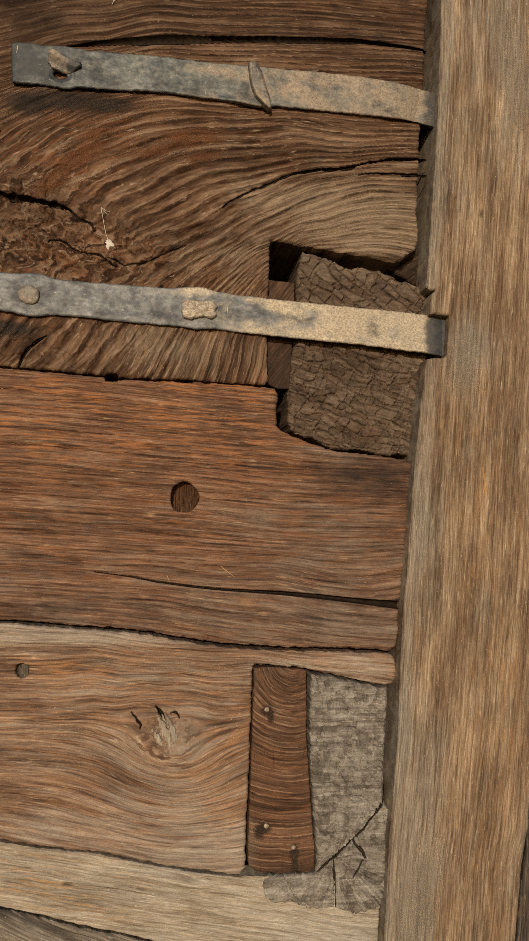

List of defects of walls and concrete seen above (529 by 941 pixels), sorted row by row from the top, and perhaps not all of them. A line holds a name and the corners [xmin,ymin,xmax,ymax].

crack [67,34,426,54]
crack [222,158,427,208]
crack [0,191,186,267]
crack [97,572,399,609]